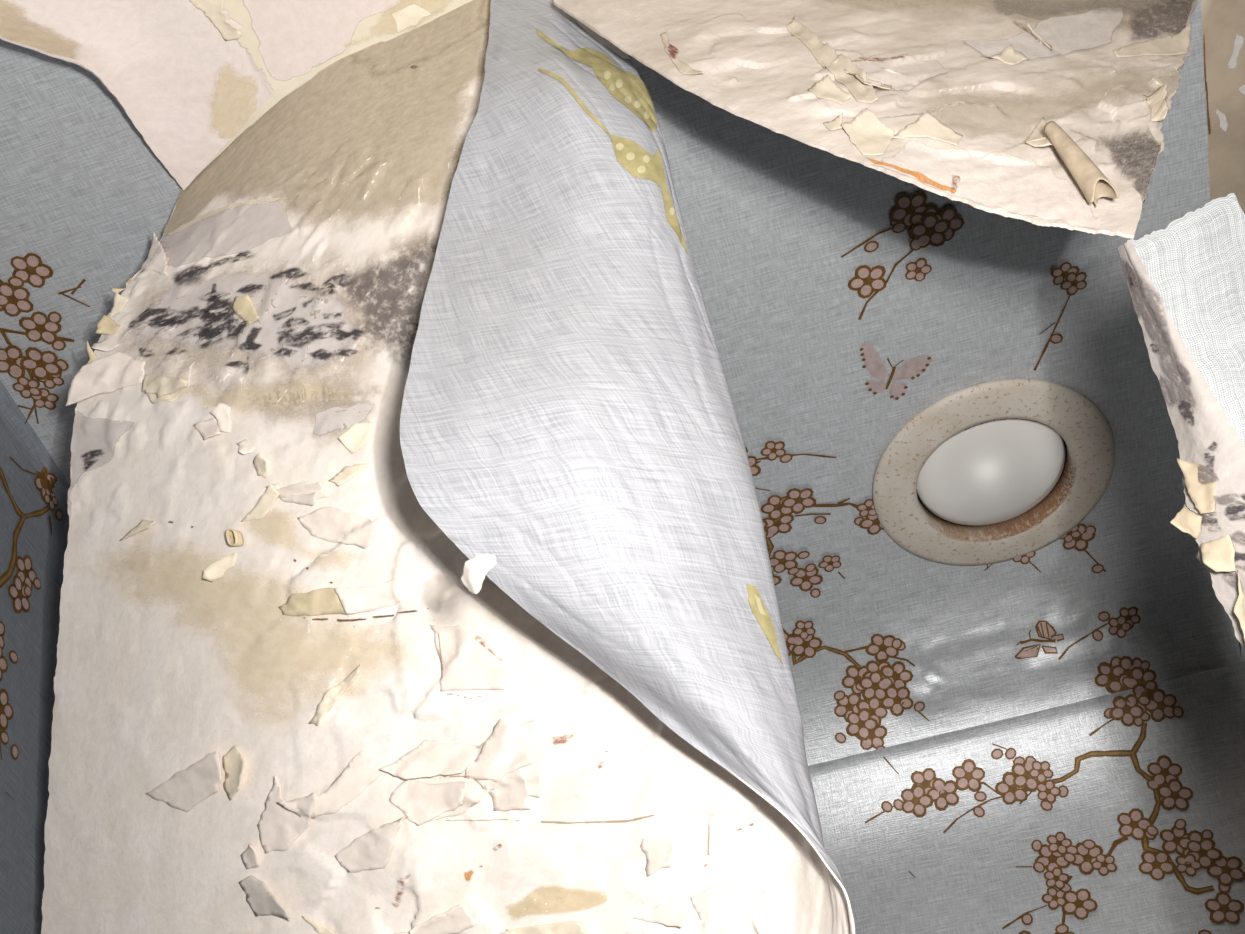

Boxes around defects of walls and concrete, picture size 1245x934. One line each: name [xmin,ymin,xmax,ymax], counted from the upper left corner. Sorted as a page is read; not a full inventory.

peeling [964,7,1191,65]
peeling [786,16,1113,230]
peeling [65,197,355,515]
leakage [129,238,434,428]
mould [1122,260,1194,425]
leakage [82,450,102,470]
leakage [125,553,390,693]
peeling [193,402,378,548]
mould [1185,442,1217,492]
peeling [1170,458,1245,641]
mould [1199,495,1245,587]
peeling [239,718,545,934]